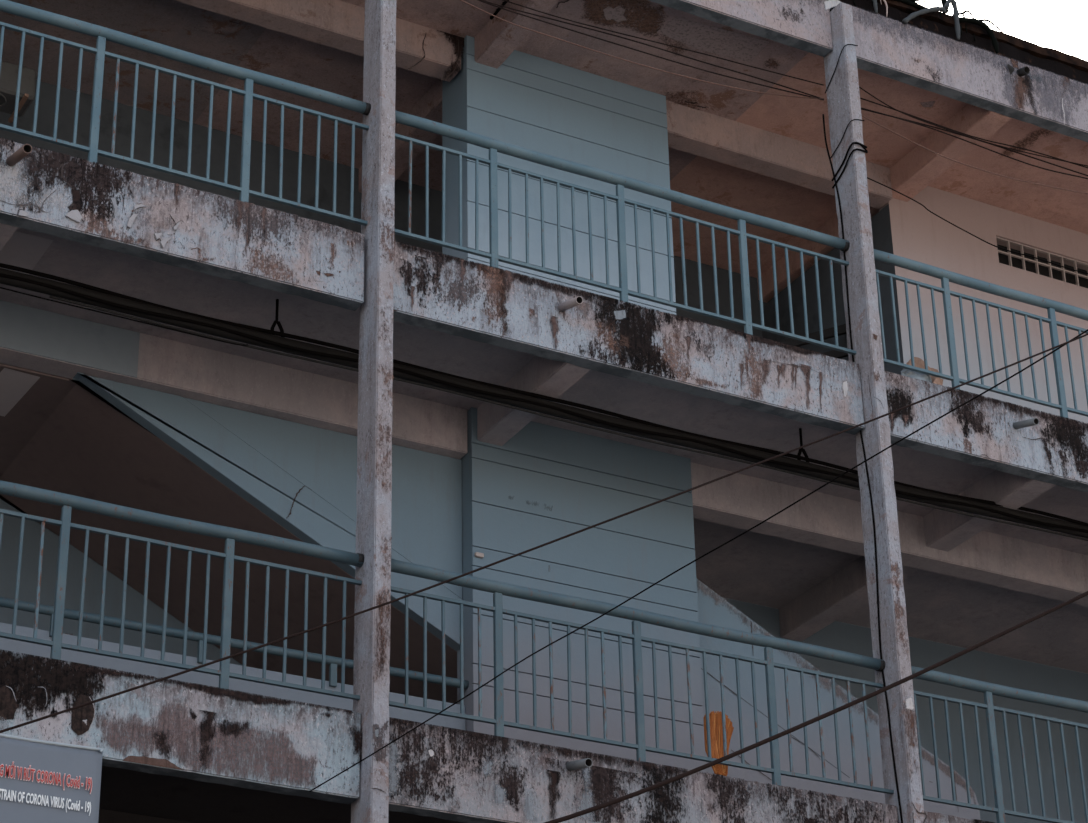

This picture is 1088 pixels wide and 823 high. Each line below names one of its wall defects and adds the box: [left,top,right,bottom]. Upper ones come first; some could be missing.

peeling [0,162,84,223]
damp [0,137,134,223]
damp [207,193,340,253]
damp [397,242,715,380]
corrosion [741,334,765,399]
damp [726,328,839,409]
damp [886,385,914,432]
damp [948,386,1088,479]
damp [0,650,353,788]
damp [350,727,362,764]
damp [389,717,686,823]
damp [704,773,890,823]